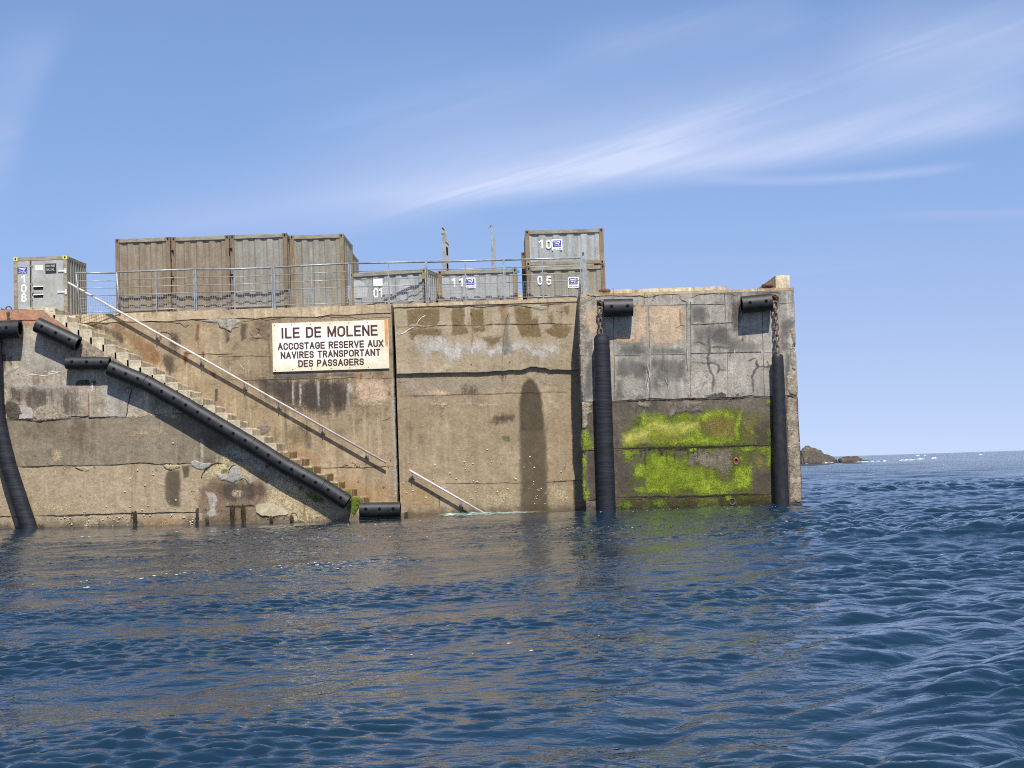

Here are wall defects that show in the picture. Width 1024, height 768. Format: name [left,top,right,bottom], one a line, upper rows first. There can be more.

water stain [407,306,570,363]
water stain [259,373,353,415]
crack [593,341,794,403]
water stain [166,438,204,506]
peeling [163,445,319,522]